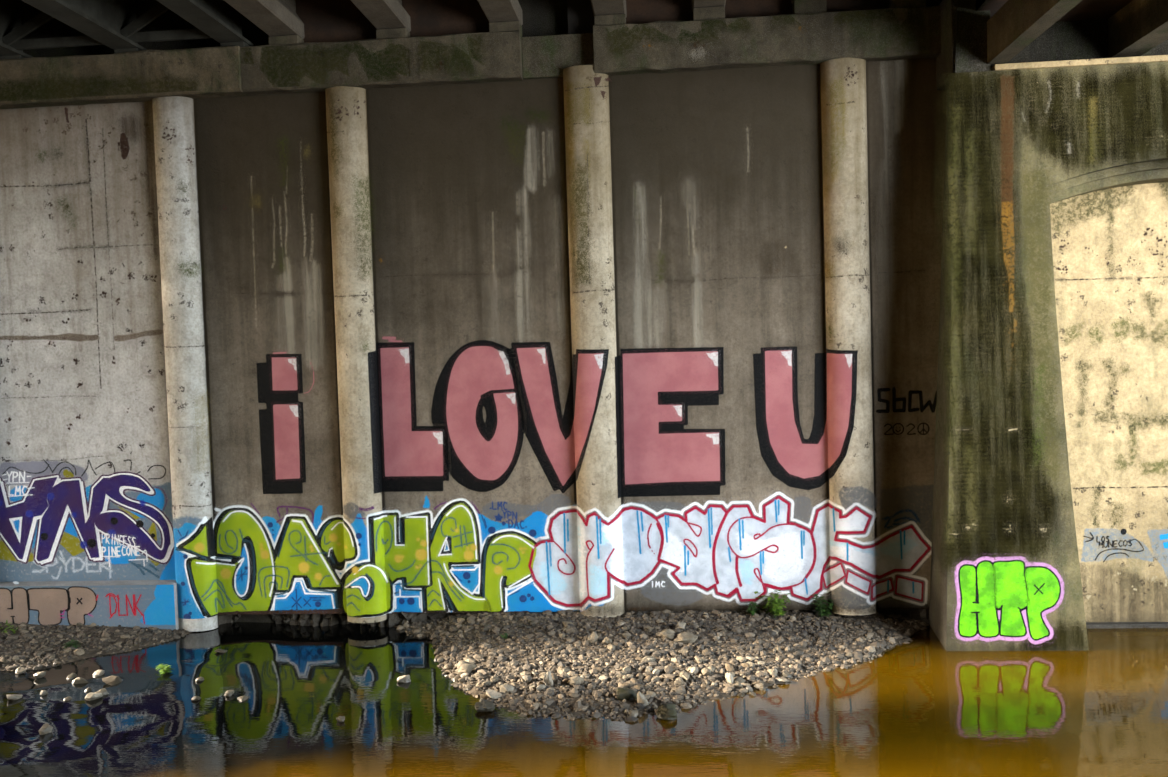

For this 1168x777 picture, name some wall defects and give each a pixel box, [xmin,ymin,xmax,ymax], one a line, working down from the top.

damp [247,126,332,375]
damp [482,74,607,344]
damp [538,7,1168,651]